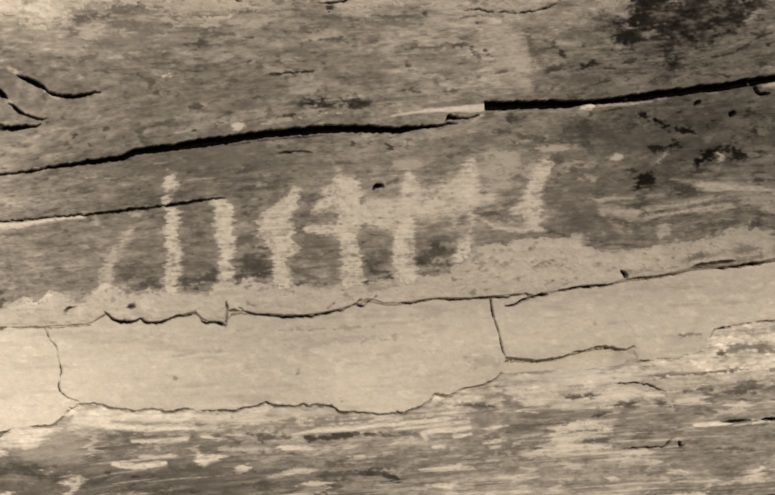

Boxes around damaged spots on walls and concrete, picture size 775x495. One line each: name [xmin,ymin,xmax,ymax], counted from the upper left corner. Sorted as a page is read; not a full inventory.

crack [0,90,43,132]
crack [19,77,97,99]
crack [484,76,775,111]
leakage [515,0,775,205]
crack [0,115,467,176]
crack [0,198,217,223]
leakage [531,173,620,251]
crack [109,306,226,326]
crack [249,302,367,319]
crack [402,284,610,353]
peeling [67,364,775,495]
crack [724,416,775,424]